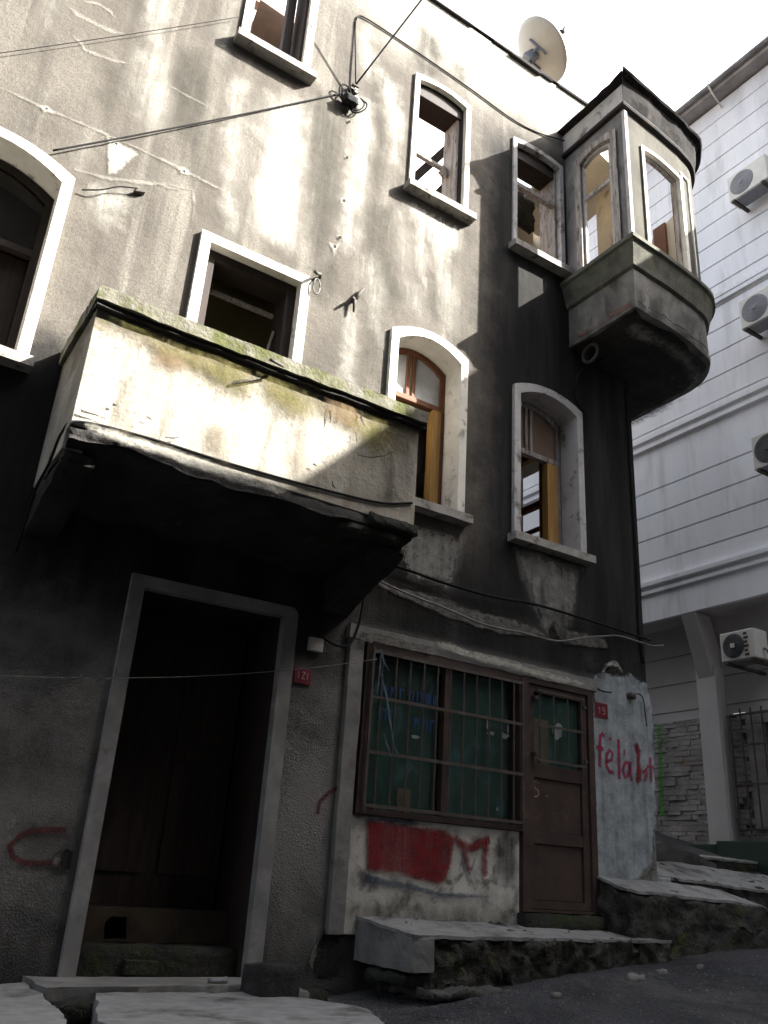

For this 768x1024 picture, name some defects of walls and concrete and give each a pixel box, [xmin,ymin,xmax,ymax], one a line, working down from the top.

leakage [361,30,372,73]
leakage [255,106,301,241]
flaking render [378,581,608,648]